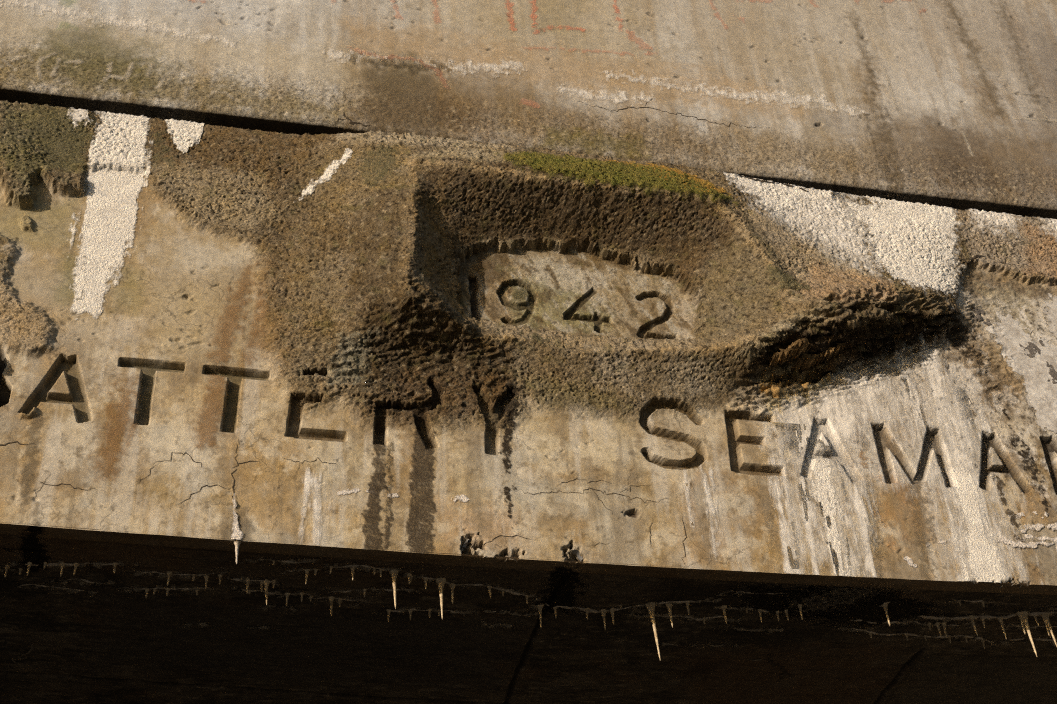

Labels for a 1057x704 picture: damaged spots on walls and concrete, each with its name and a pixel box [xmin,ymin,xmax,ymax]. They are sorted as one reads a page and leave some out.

water stain [67,107,153,318]
water stain [164,119,204,153]
water stain [299,148,353,200]
crack [580,96,770,128]
spalling [742,258,1057,433]
water stain [0,172,1057,661]
crack [136,439,260,512]
crack [515,478,687,564]